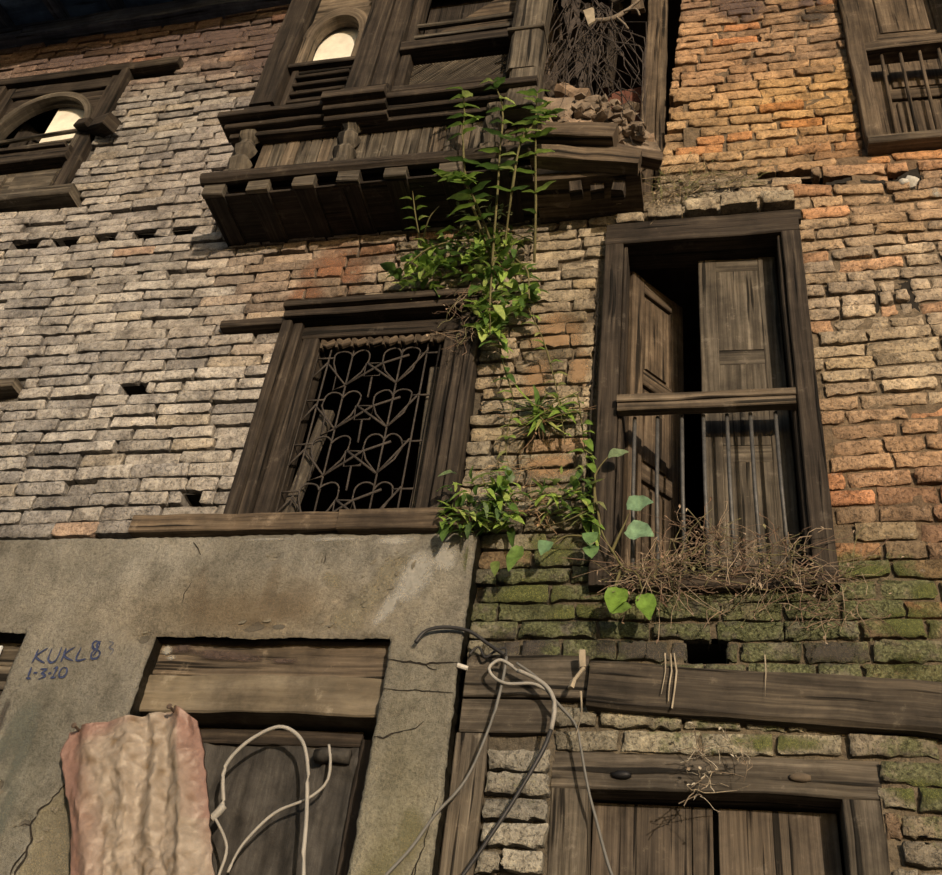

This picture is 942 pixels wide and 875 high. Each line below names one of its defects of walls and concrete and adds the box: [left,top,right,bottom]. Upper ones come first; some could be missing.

damp [497,633,545,654]
damp [597,635,686,662]
damp [799,642,866,663]
crack [383,659,457,693]
crack [374,721,424,739]
crack [10,784,65,875]
crack [411,798,438,875]